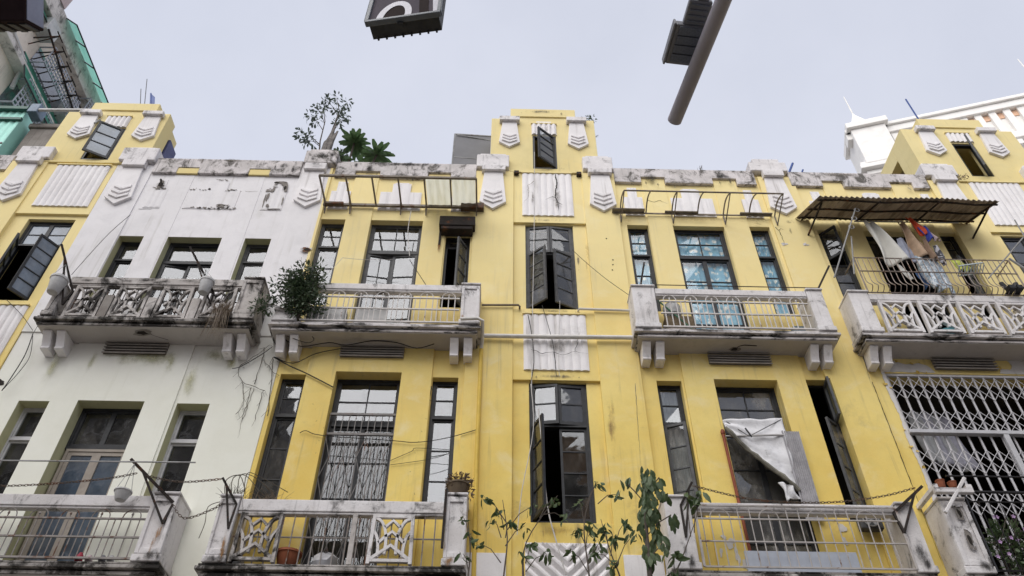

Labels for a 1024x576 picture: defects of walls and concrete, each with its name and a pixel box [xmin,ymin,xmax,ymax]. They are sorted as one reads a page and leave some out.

spalling [262,181,288,210]
crack [528,174,561,210]